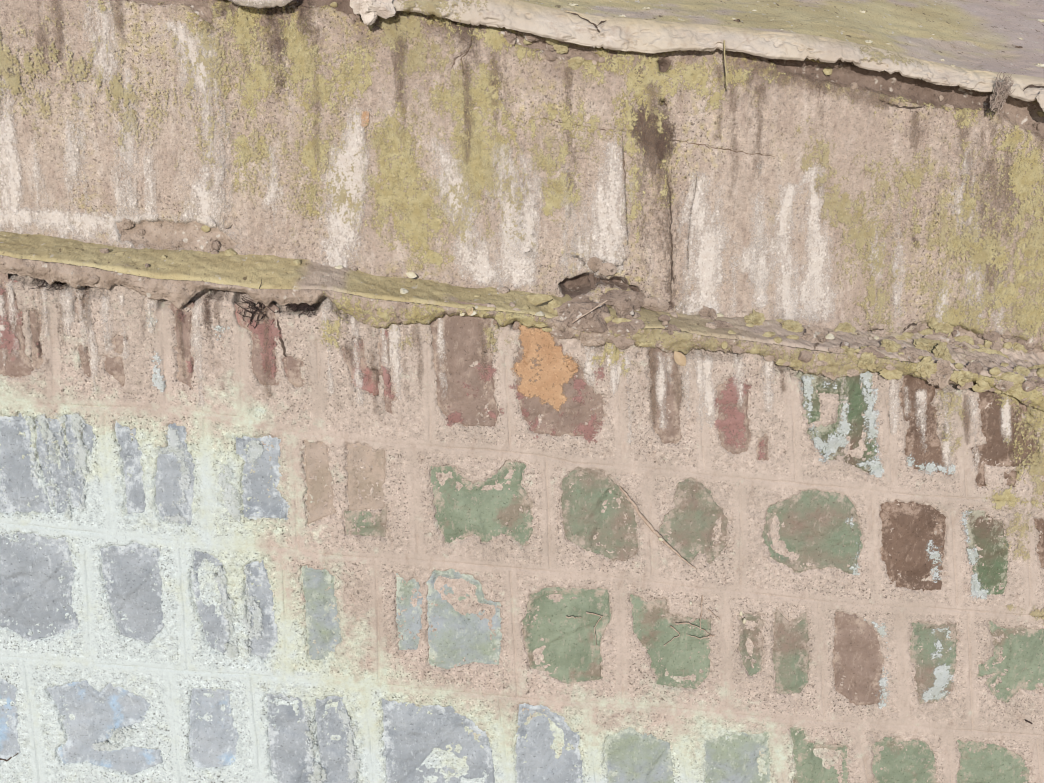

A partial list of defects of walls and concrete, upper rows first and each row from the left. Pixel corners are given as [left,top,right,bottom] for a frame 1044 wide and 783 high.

damp [0,0,231,247]
spalling [288,0,361,16]
efflorescence [321,111,369,268]
damp [432,138,543,287]
spalling [498,28,605,70]
damp [562,142,628,278]
spalling [559,271,640,299]
spalling [658,56,672,73]
crack [666,171,697,300]
crack [670,140,774,157]
damp [658,166,836,321]
spalling [767,58,1044,139]